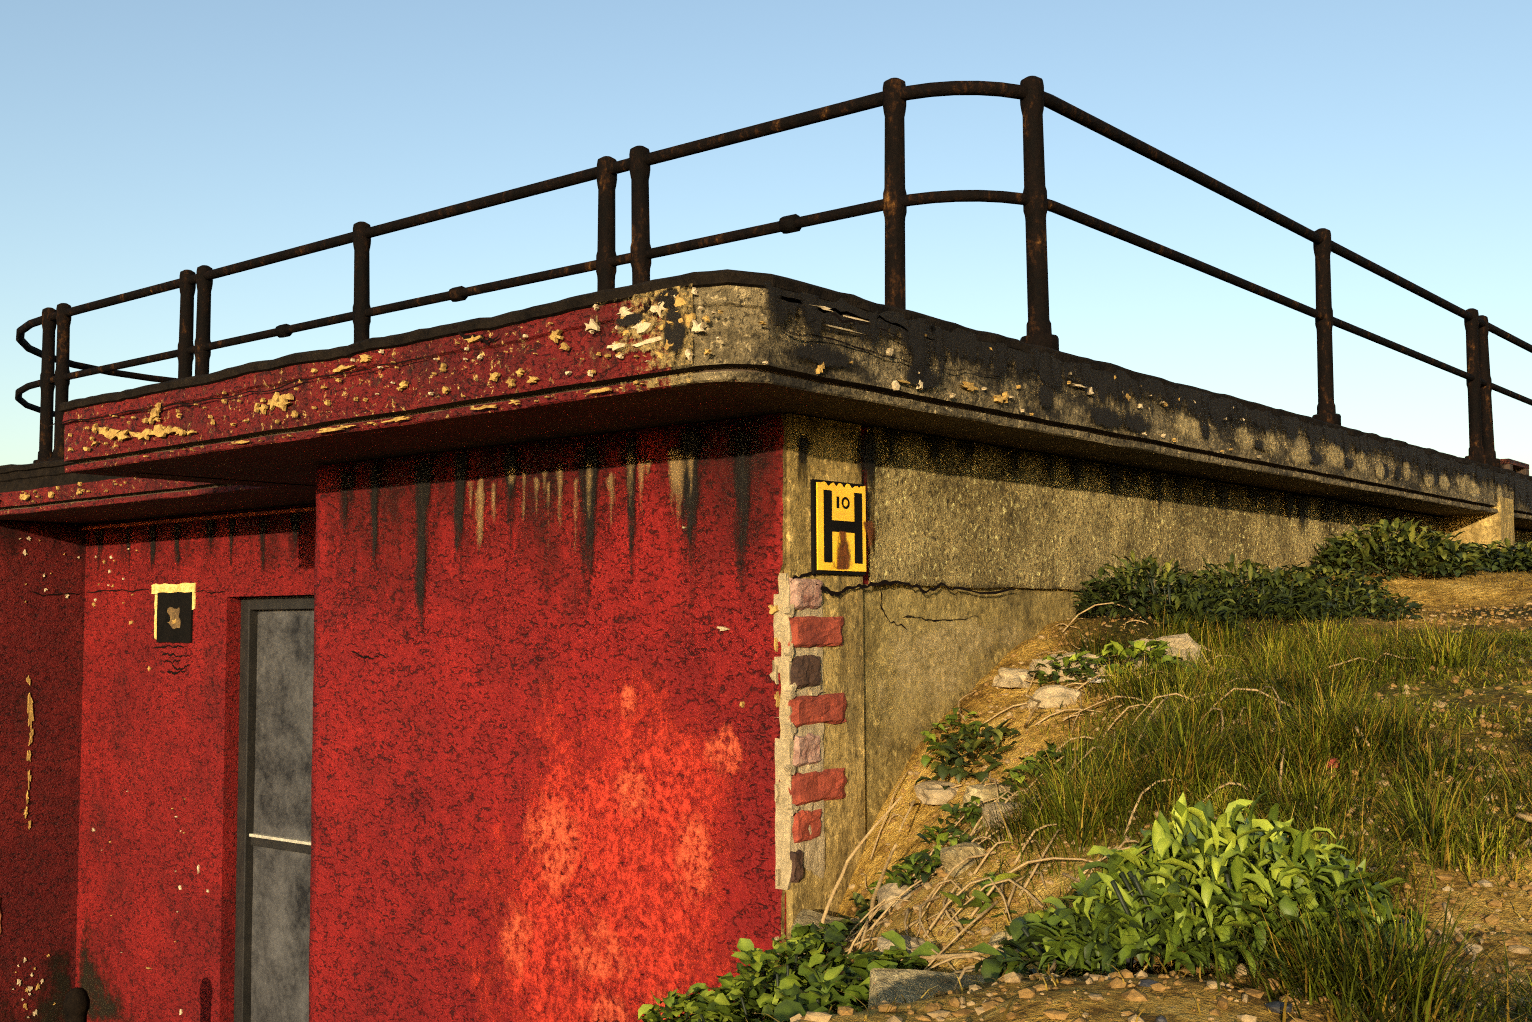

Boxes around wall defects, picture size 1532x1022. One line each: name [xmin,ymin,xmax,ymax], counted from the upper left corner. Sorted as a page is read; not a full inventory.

peeling [68,349,413,459]
peeling [428,335,549,410]
peeling [548,283,724,394]
peeling [813,305,869,335]
water stain [765,281,1532,522]
water stain [339,433,650,623]
water stain [670,415,773,580]
water stain [1046,455,1444,535]
crack [790,571,1019,630]
peeling [23,675,34,829]
flaking render [768,573,847,890]
peeling [13,954,56,1018]